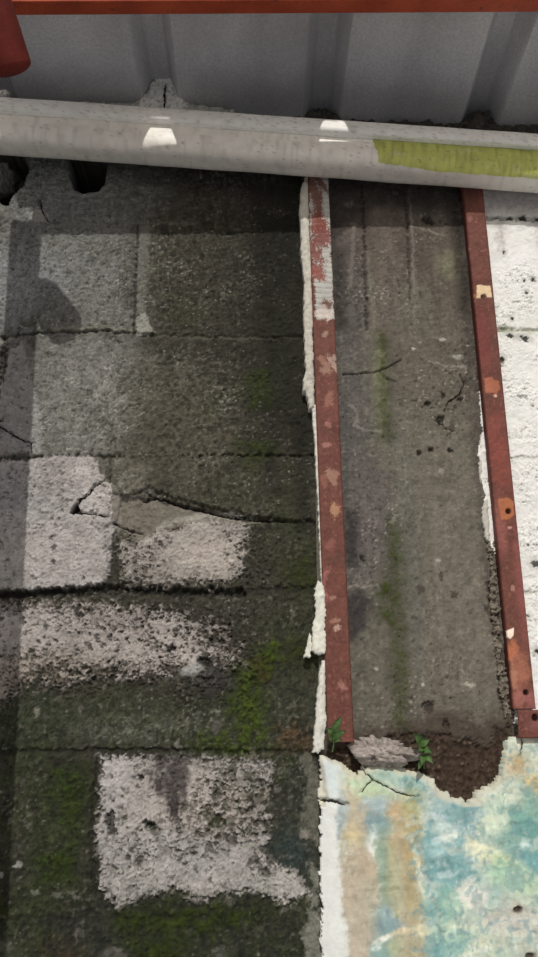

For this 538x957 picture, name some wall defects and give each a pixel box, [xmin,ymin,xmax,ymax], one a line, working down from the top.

crack [77,483,139,537]
crack [146,496,282,523]
spalling [387,499,516,802]
rust [507,642,518,657]
crack [320,769,419,805]